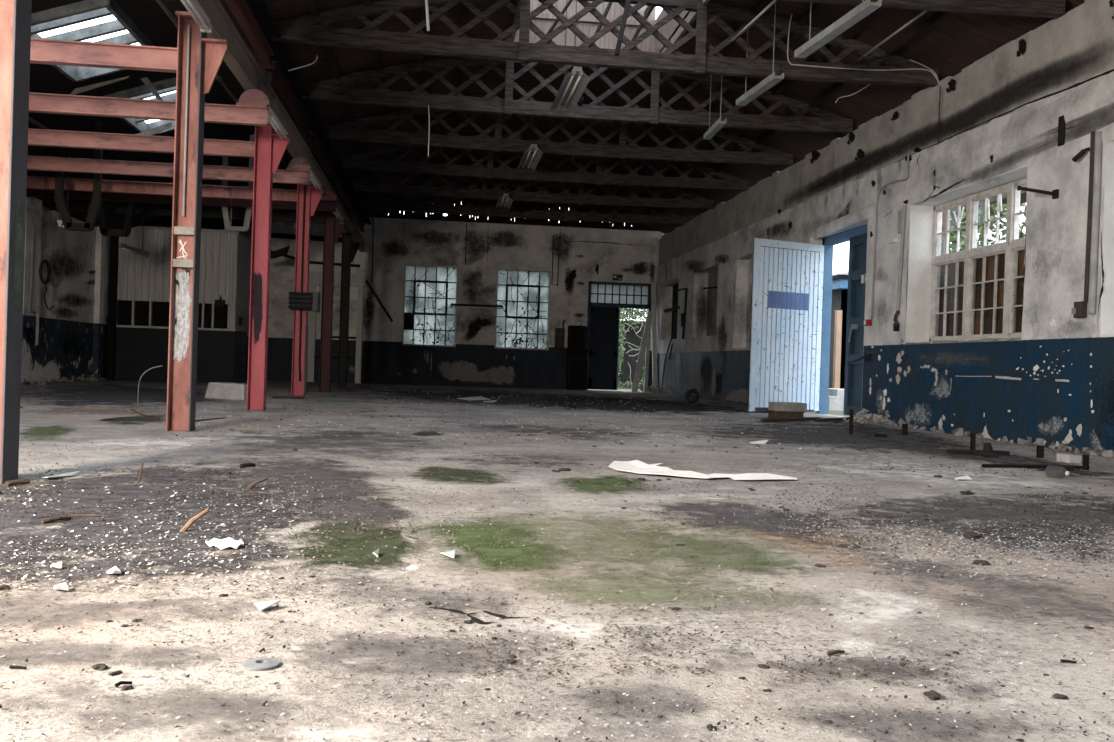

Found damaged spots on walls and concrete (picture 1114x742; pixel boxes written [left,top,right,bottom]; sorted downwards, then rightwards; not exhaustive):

leakage [419,230,521,262]
leakage [551,234,585,285]
leakage [57,294,90,318]
leakage [406,279,417,317]
peeling [869,346,948,418]
flaking render [1027,418,1082,447]